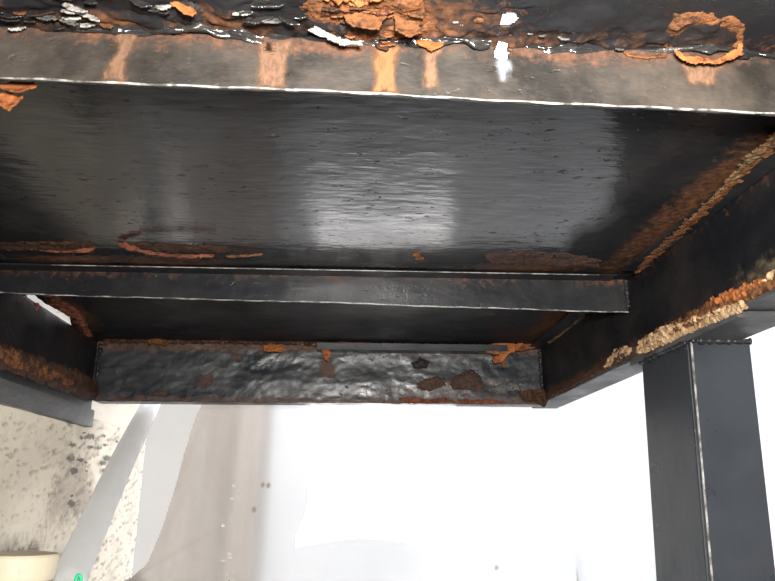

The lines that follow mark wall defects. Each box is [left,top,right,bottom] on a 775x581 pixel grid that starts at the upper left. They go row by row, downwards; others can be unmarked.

corrosion [299,0,444,92]
corrosion [621,11,745,85]
corrosion [0,81,37,111]
corrosion [0,343,99,398]
corrosion [399,397,506,405]
corrosion [519,260,775,408]